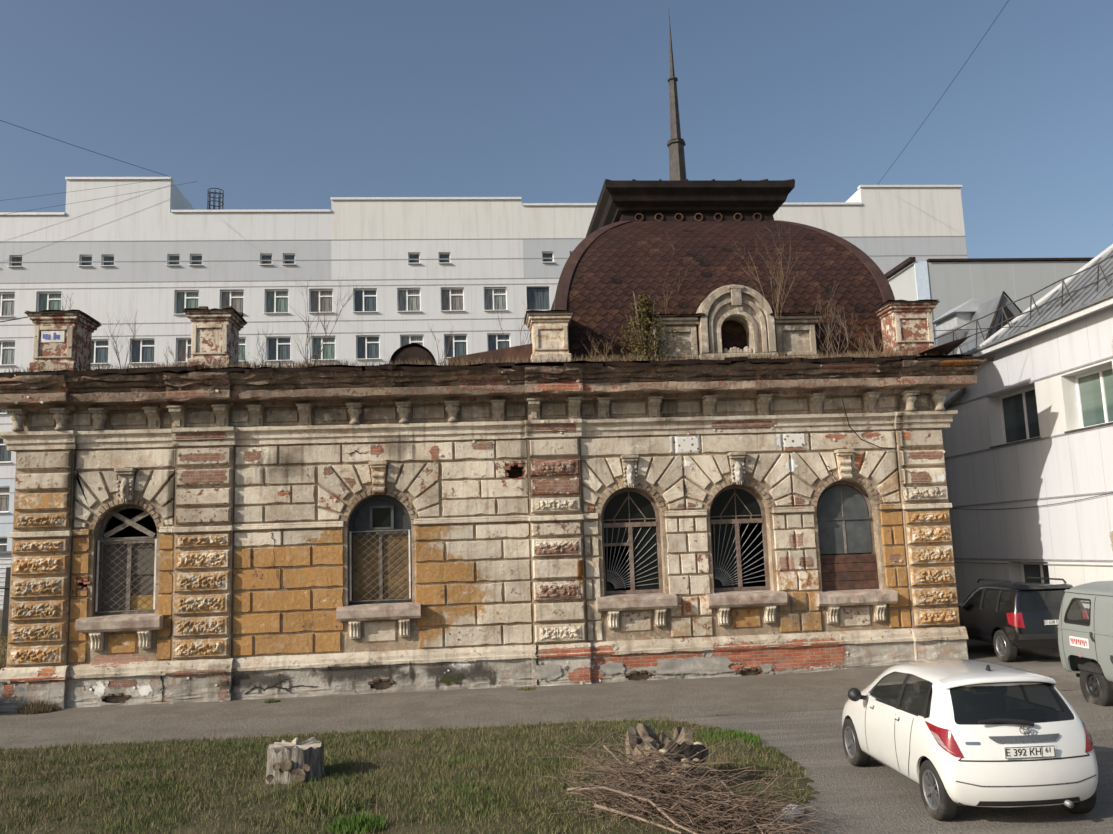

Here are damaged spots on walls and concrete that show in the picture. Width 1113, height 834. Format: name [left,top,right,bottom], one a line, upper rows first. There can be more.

flaking render [165,388,219,398]
flaking render [900,430,946,486]
flaking render [504,460,578,494]
leakage [221,672,292,694]
leakage [312,662,495,688]
flaking render [537,636,849,684]